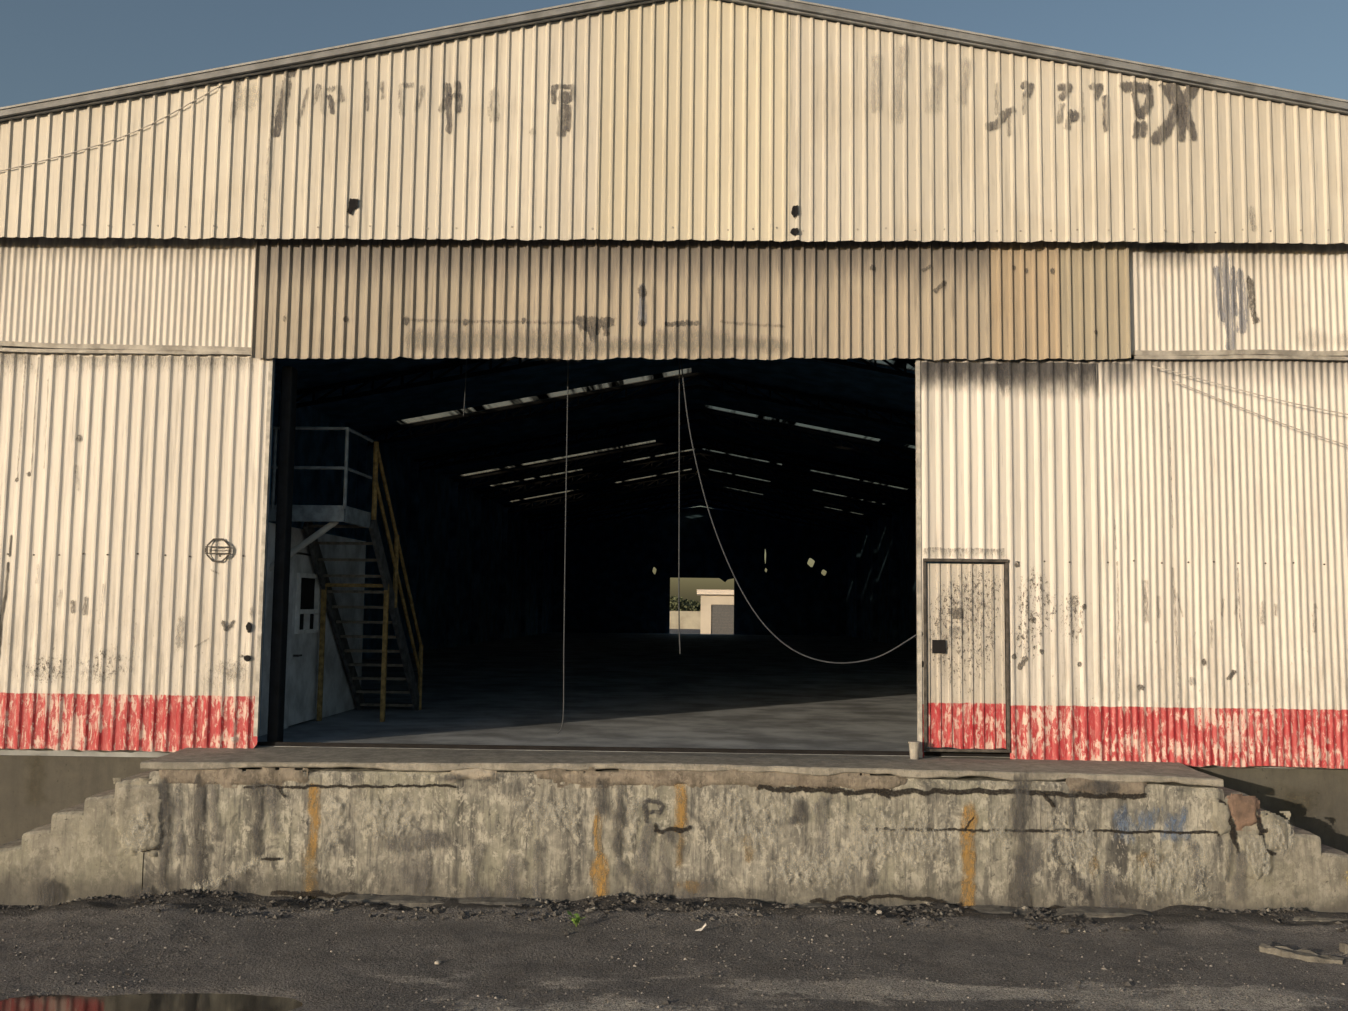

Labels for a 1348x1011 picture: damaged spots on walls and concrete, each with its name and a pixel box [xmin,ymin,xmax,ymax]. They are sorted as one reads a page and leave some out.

damp [596,781,712,899]
damp [789,801,828,857]
spalling [1124,794,1296,901]